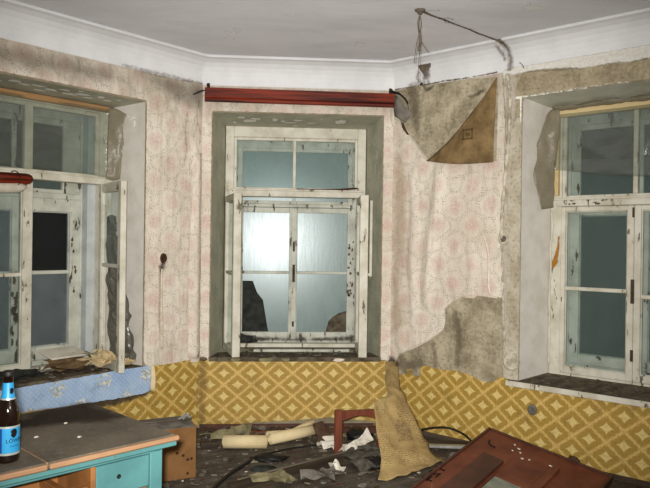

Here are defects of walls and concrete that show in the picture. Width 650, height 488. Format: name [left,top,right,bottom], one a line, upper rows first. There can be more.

flaking render [394,44,650,383]